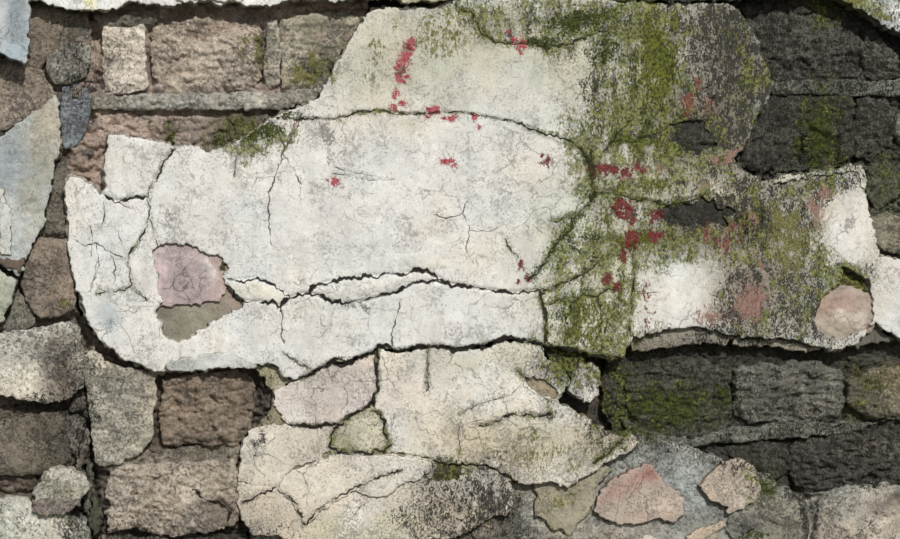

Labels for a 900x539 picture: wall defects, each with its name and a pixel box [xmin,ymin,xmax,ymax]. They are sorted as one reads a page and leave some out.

spalling [0,0,369,193]
water stain [522,29,560,53]
water stain [578,38,663,137]
crack [76,149,175,301]
water stain [563,176,627,307]
water stain [639,177,688,196]
water stain [710,187,754,243]
spalling [27,287,272,463]
crack [192,109,705,525]
spalling [598,267,900,445]
peeling [277,405,465,524]
spalling [492,435,900,539]